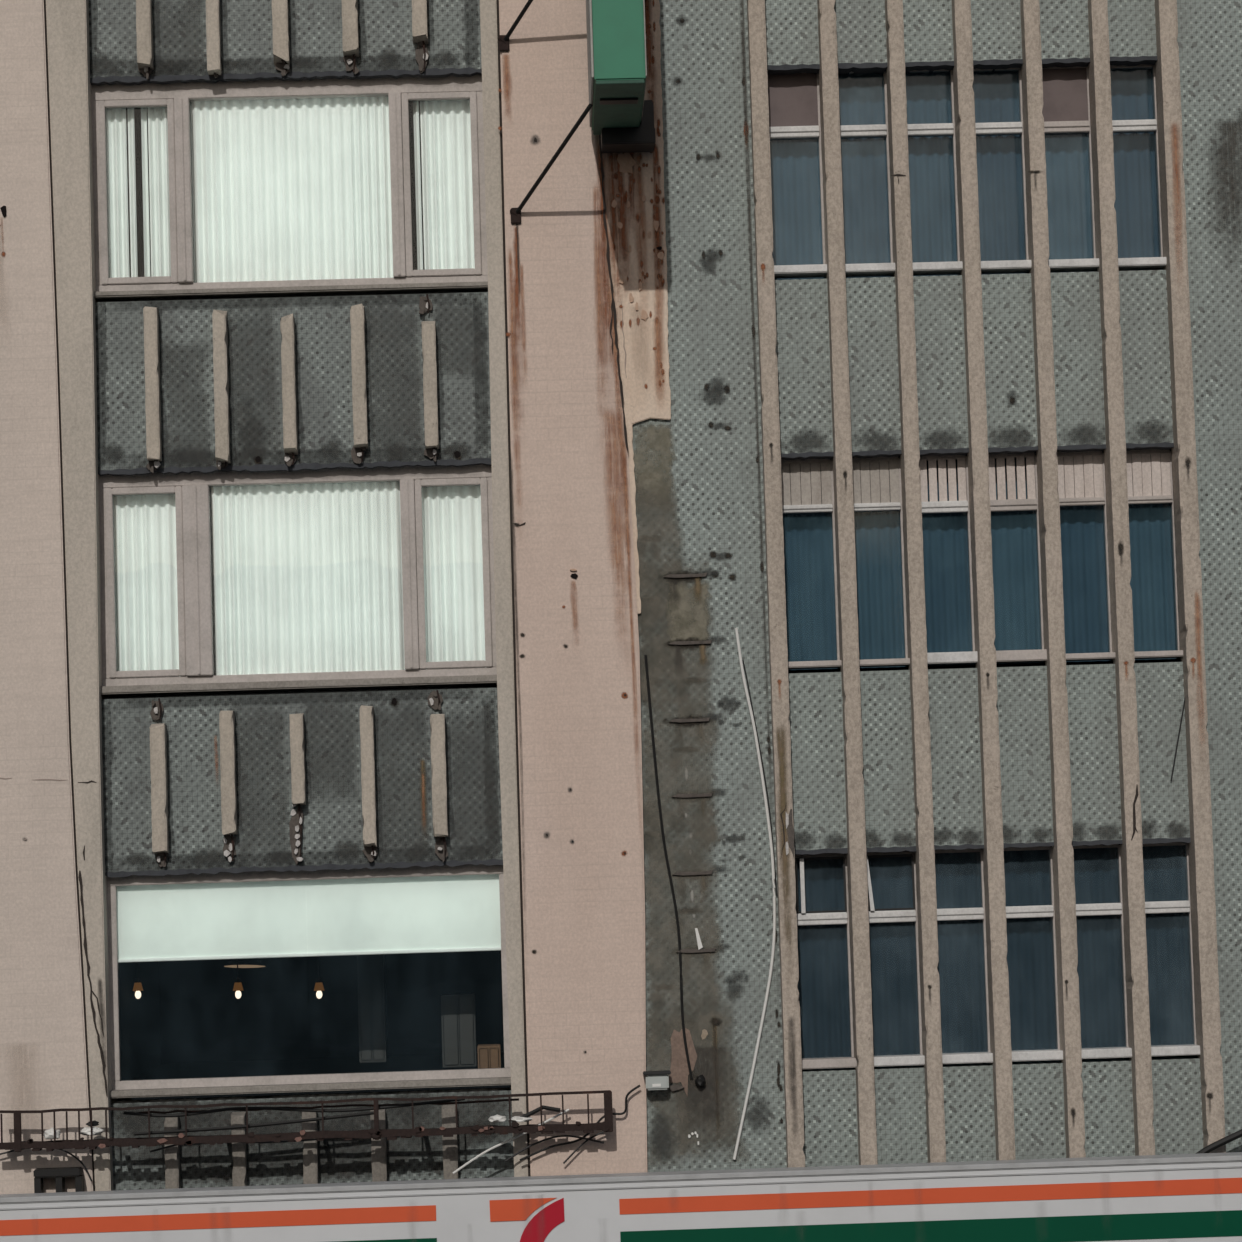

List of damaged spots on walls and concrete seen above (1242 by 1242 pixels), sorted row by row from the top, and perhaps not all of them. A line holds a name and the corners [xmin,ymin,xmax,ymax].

rust [644,0,656,101]
peeling [609,153,664,327]
rust [638,119,665,333]
water stain [1219,121,1242,230]
rust [506,225,525,411]
water stain [748,194,773,481]
rust [595,149,635,694]
water stain [710,551,736,580]
water stain [718,699,739,726]
crack [0,776,96,784]
water stain [679,890,703,950]